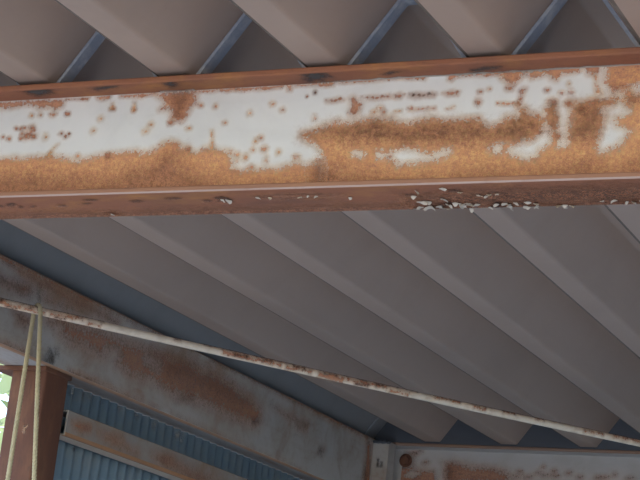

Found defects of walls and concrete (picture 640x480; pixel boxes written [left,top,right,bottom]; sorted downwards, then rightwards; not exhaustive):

corrosion [0,65,640,192]
corrosion [0,186,640,219]
peeling [406,188,576,213]
corrosion [204,344,412,396]
corrosion [444,463,530,480]